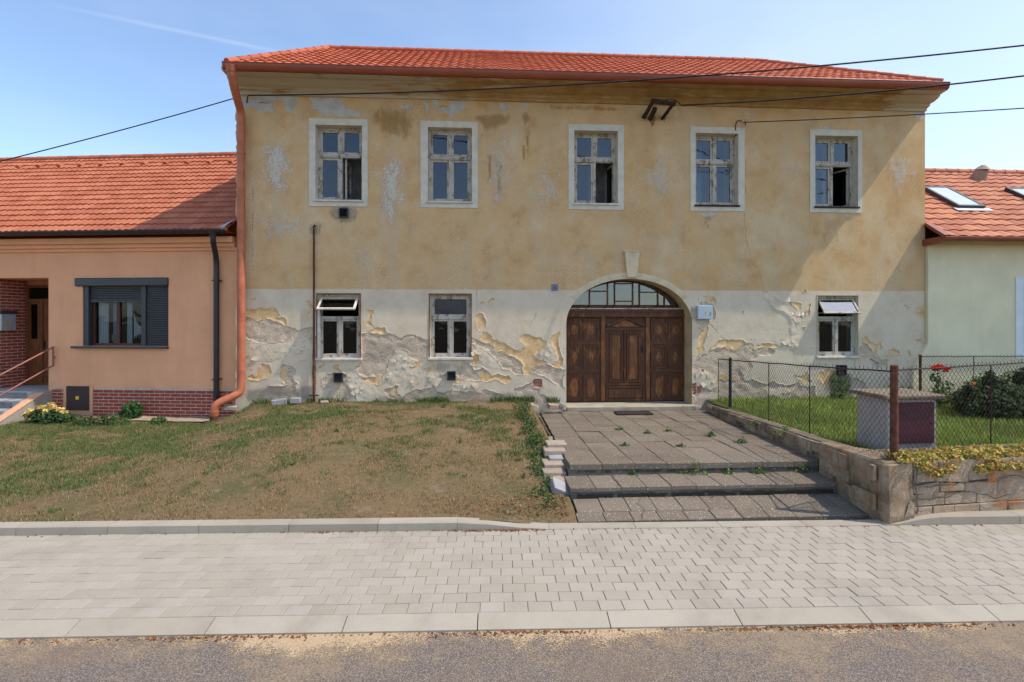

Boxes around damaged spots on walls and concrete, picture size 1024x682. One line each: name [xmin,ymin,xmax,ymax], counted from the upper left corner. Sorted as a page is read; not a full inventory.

crack [744,189,807,335]
flaking render [246,363,299,402]
flaking render [236,299,316,345]
flaking render [318,297,566,408]
flaking render [690,295,835,407]
flaking render [857,336,922,369]